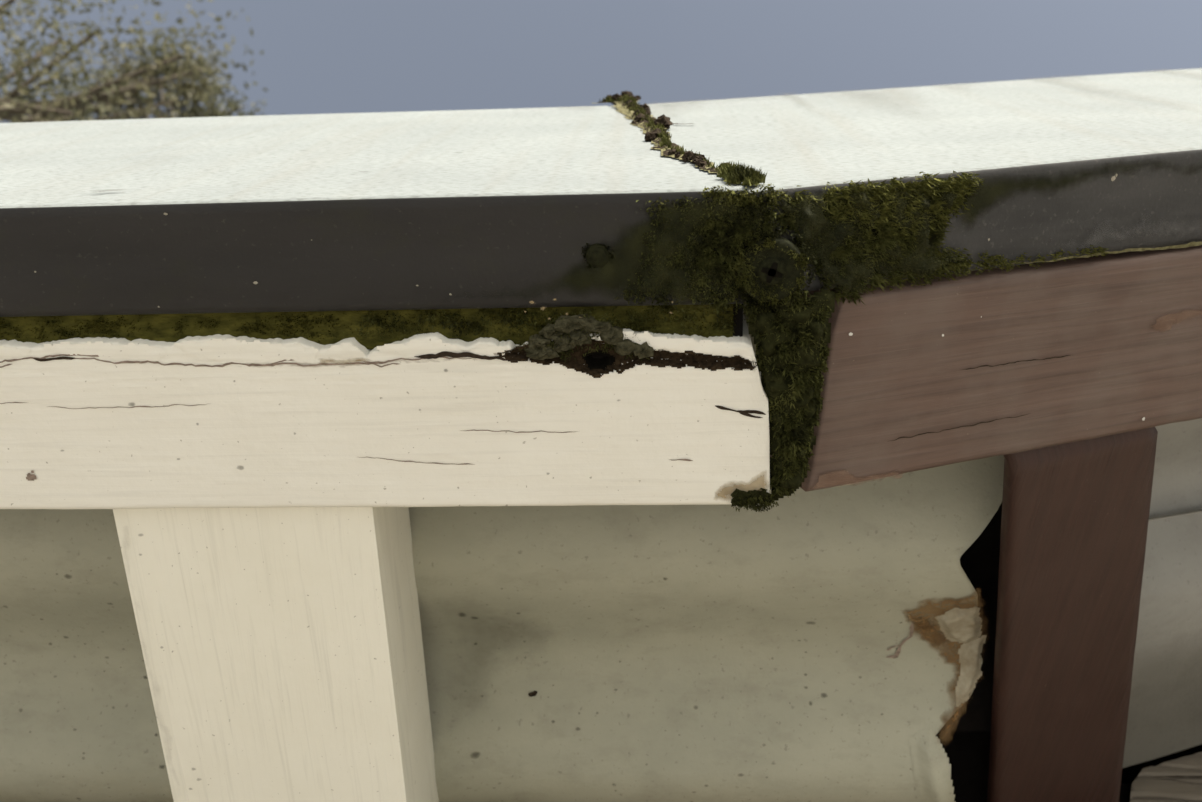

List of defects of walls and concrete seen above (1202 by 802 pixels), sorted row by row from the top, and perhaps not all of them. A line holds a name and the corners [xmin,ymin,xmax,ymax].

peeling [0,338,526,364]
peeling [623,331,753,356]
water stain [717,475,779,513]